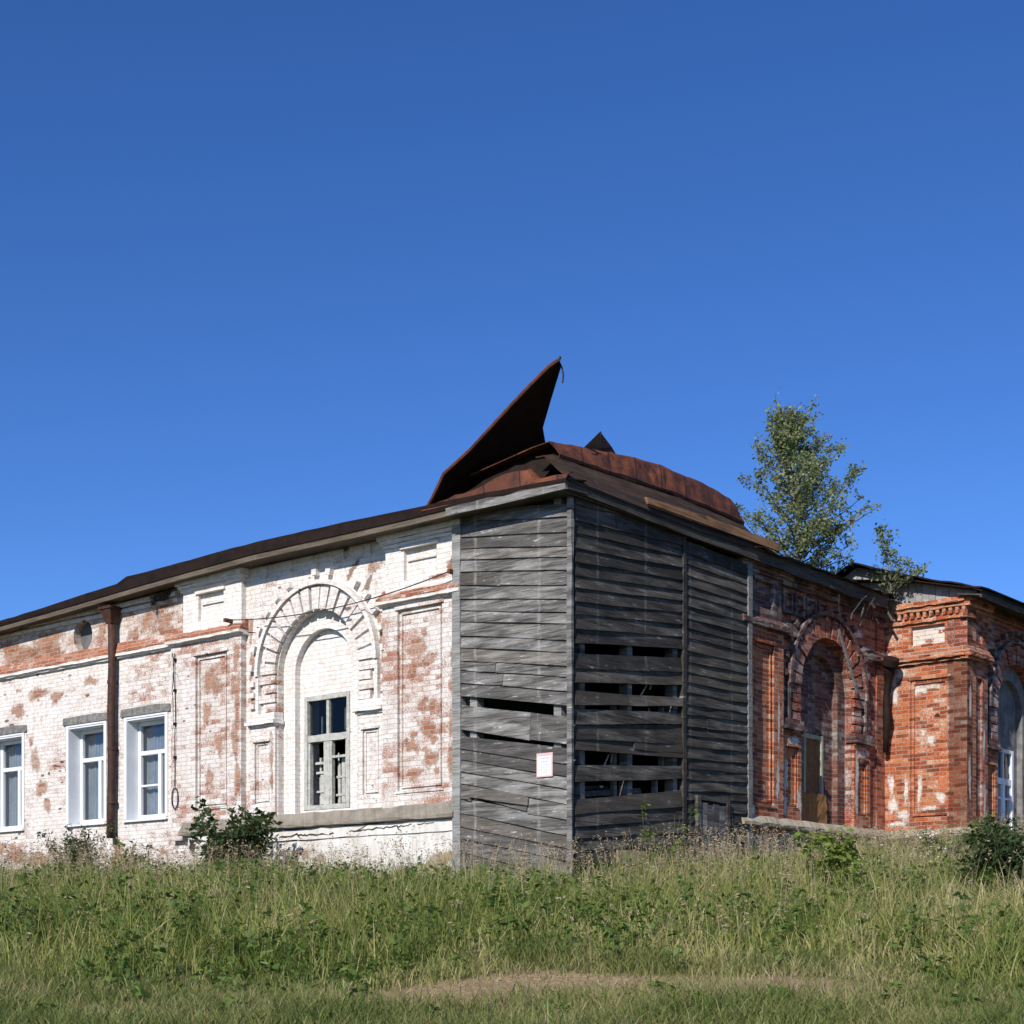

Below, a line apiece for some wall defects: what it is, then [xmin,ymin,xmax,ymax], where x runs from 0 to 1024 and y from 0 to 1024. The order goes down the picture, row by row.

peeling [0,629,65,664]
peeling [128,603,175,641]
peeling [407,627,437,678]
peeling [4,687,67,718]
peeling [203,621,255,796]
peeling [404,697,452,781]
peeling [29,737,64,812]